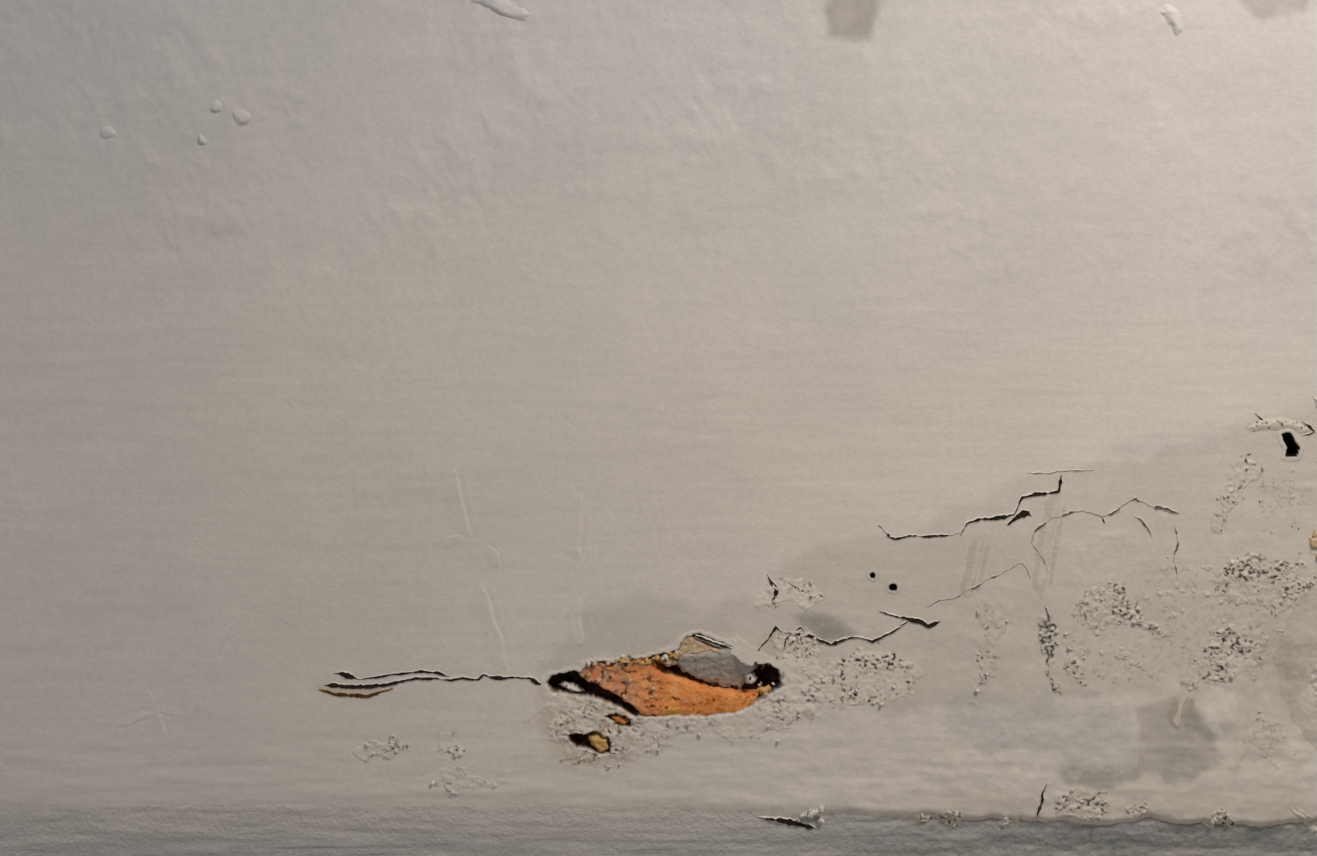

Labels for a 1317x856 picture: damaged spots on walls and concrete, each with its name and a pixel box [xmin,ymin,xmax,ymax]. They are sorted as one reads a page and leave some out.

crack [757,469,1180,652]
peeling [1037,413,1317,696]
crack [319,669,542,699]
spalling [538,577,925,769]